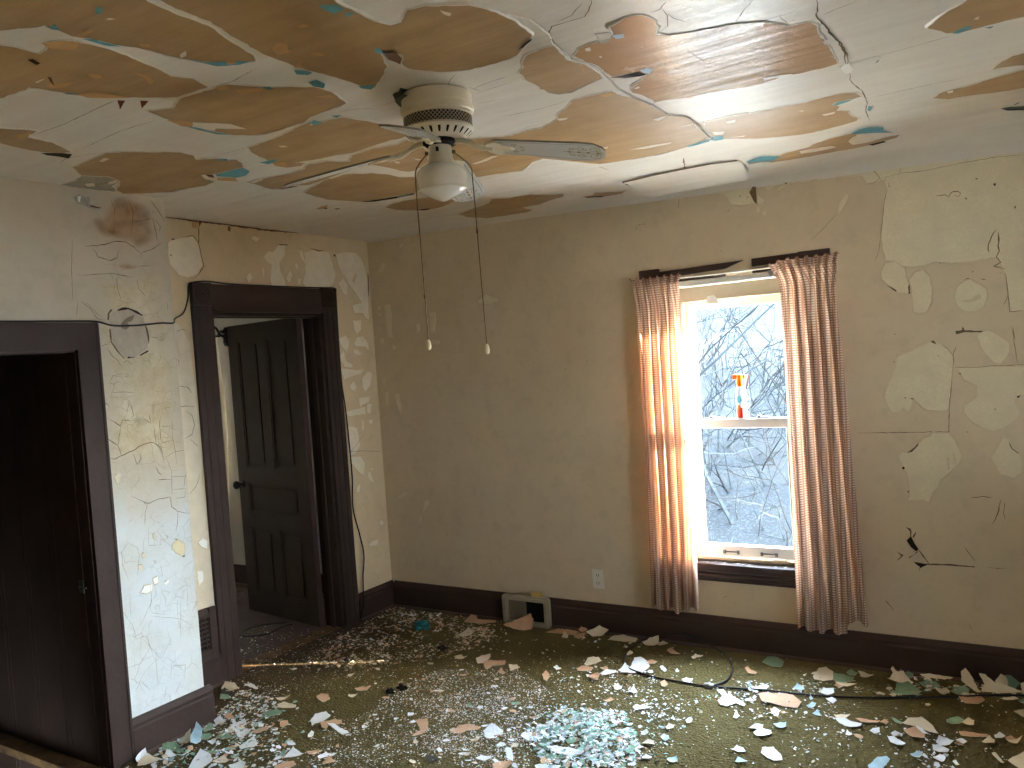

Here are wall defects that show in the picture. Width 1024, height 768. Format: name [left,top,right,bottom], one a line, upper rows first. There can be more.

peeling [0,0,901,219]
crack [650,0,952,118]
peeling [925,0,1024,34]
peeling [931,51,1024,111]
water stain [85,194,184,468]
crack [71,200,200,697]
peeling [111,322,215,718]
peeling [167,236,203,278]
peeling [263,244,374,493]
peeling [898,431,963,504]
peeling [874,152,1024,314]
peeling [884,327,1024,432]